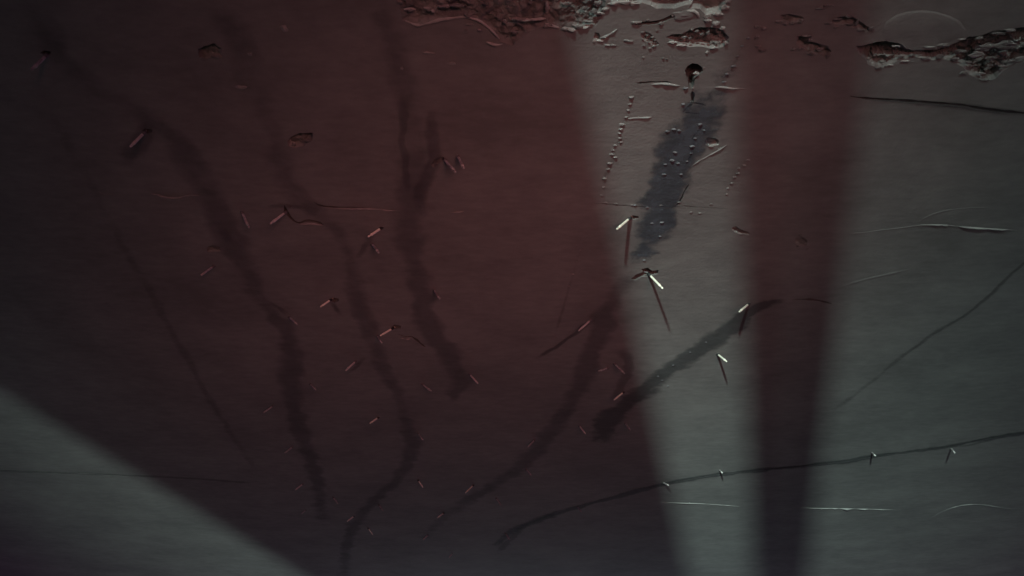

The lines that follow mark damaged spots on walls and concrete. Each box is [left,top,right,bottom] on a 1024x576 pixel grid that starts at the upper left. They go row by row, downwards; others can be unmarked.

spalling [396,0,731,60]
spalling [815,4,1024,82]
crack [851,96,1024,114]
crack [641,433,1021,490]